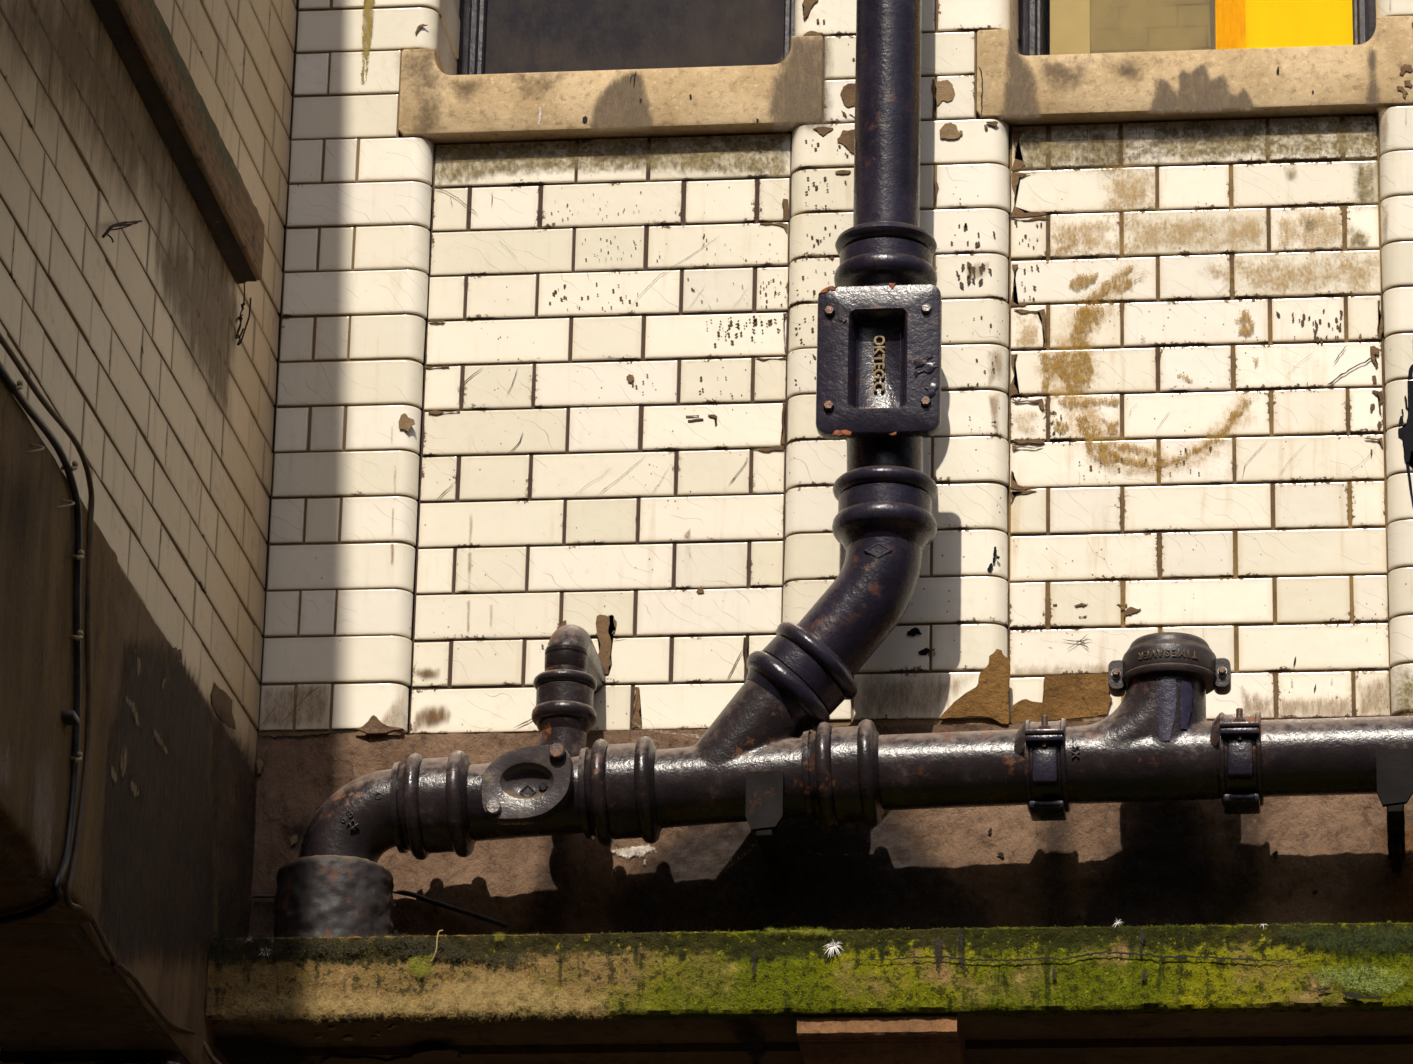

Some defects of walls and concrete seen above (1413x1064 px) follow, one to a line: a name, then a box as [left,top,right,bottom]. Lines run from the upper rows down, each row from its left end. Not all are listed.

damp [591,73,651,129]
damp [1149,65,1253,113]
damp [1059,131,1148,251]
damp [1134,217,1262,247]
damp [1280,213,1340,245]
damp [1247,260,1371,291]
damp [1235,310,1255,343]
damp [1017,265,1251,468]
spalling [596,614,617,674]
spalling [939,649,1112,725]
damp [1085,801,1258,927]
damp [231,974,605,1015]